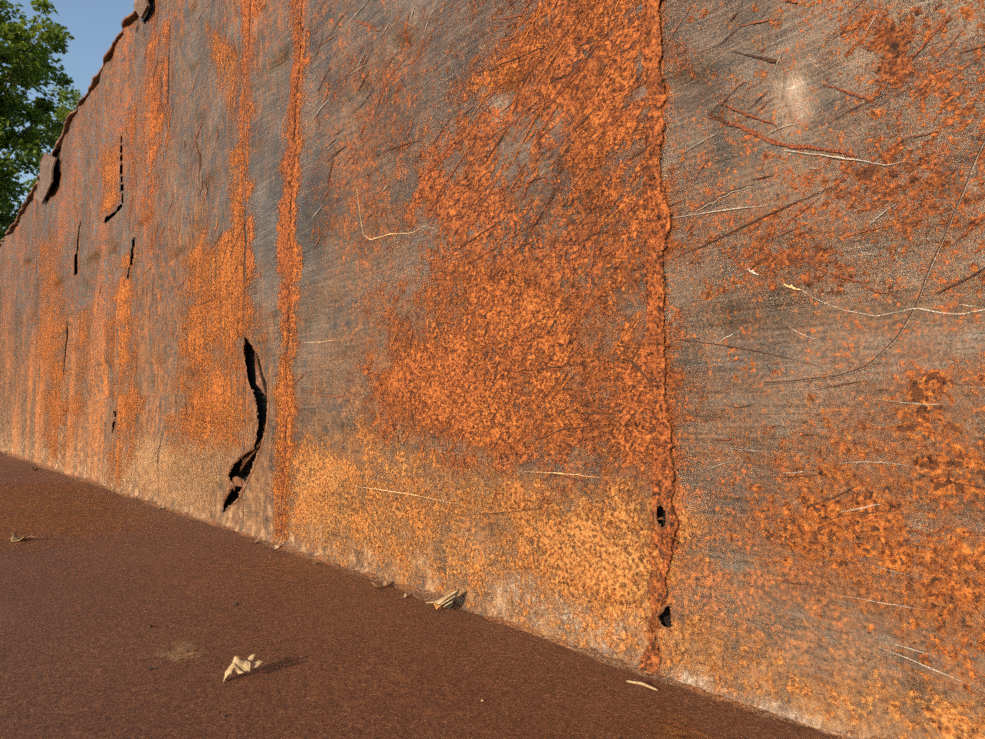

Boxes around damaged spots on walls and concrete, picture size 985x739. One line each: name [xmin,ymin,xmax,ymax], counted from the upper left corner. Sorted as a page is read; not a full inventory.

rust [32,225,92,467]
crack [109,132,123,220]
rust [99,0,267,520]
rust [269,0,985,739]
water stain [680,672,706,689]
water stain [759,703,819,728]